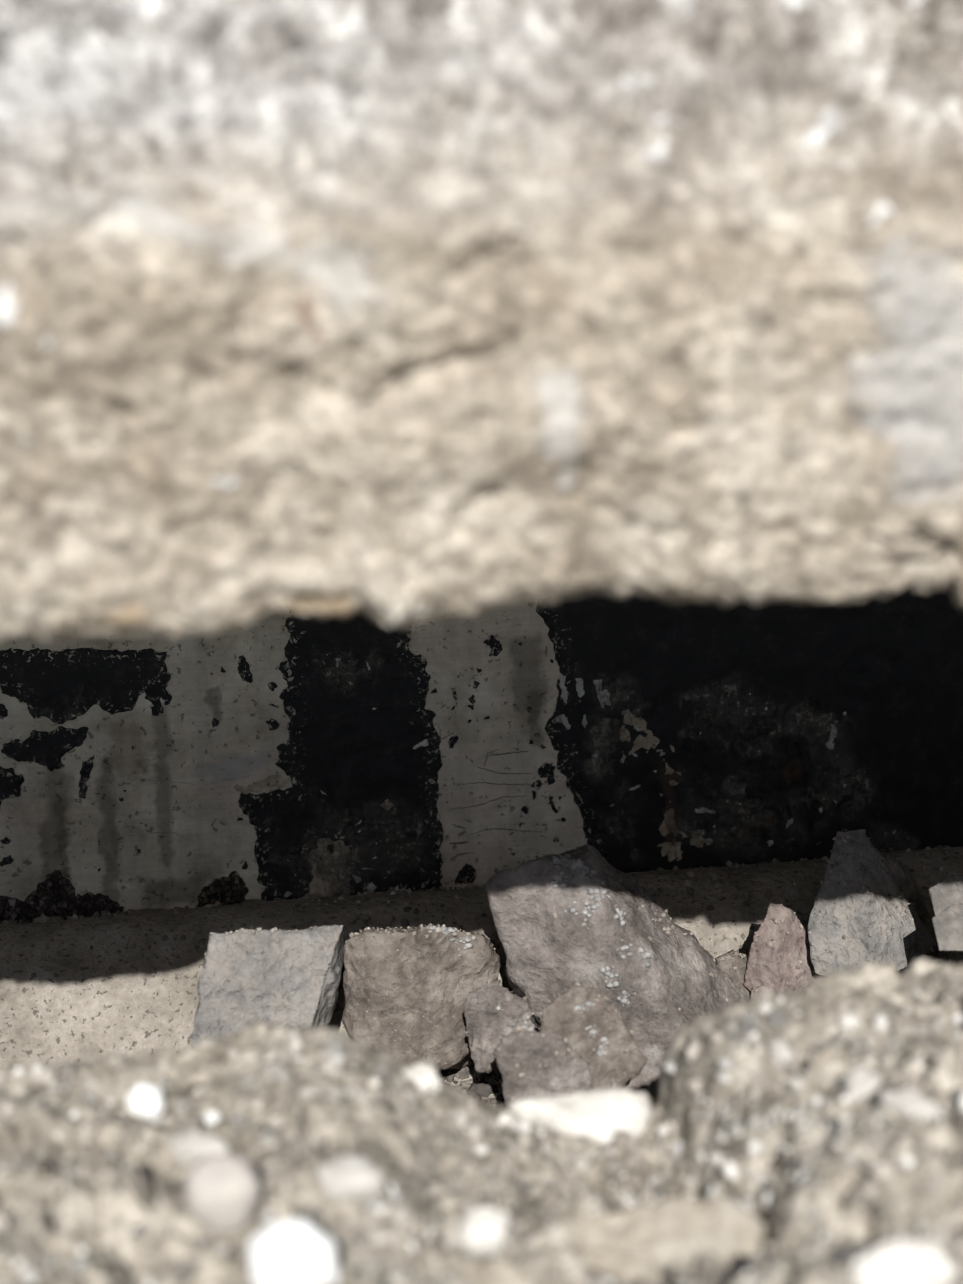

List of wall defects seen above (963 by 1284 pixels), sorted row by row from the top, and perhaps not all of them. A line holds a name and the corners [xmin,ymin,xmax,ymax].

spalling [88,602,154,632]
peeling [483,633,503,656]
peeling [0,648,172,810]
peeling [195,592,490,908]
peeling [509,585,963,873]
peeling [0,836,14,867]
flaking render [0,870,124,924]